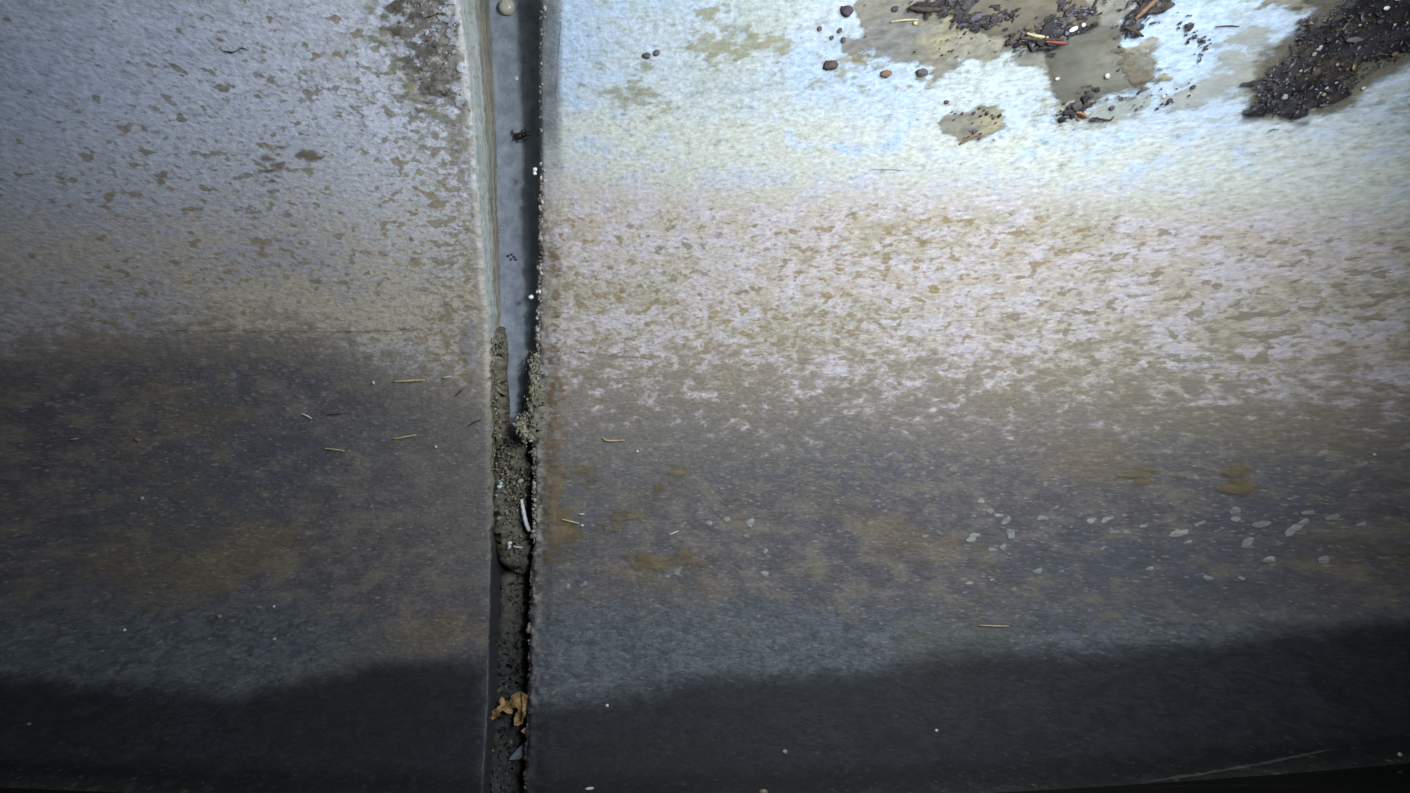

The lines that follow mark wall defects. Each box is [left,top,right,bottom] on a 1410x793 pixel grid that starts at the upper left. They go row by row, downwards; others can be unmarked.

spalling [366,0,471,122]
damp [939,105,1006,143]
damp [813,0,1410,130]